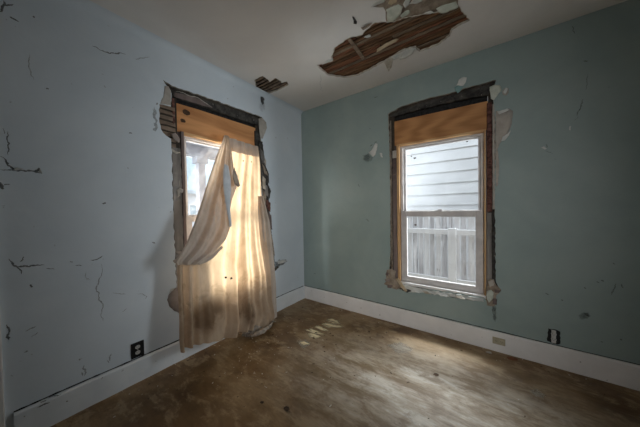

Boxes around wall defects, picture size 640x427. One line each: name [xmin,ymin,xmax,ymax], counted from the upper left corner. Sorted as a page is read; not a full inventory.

flaking render [317,0,470,78]
crack [0,129,42,189]
flaking render [153,86,180,154]
flaking render [254,76,289,94]
peeling [490,85,509,100]
peeling [495,109,513,186]
crack [9,257,53,274]